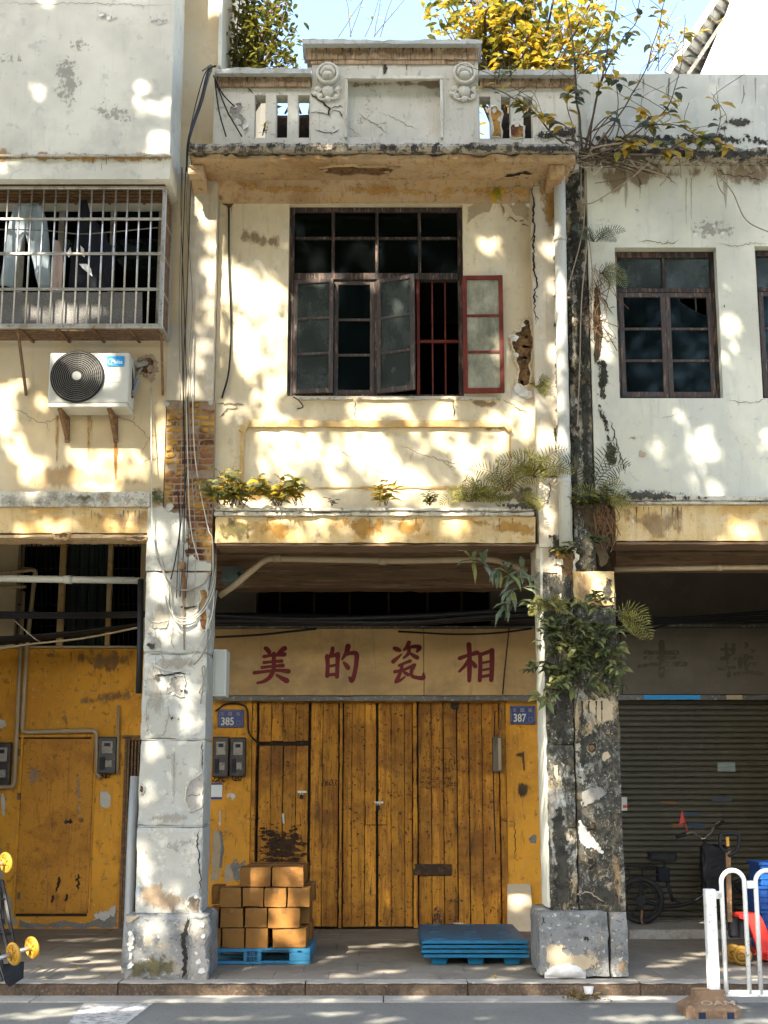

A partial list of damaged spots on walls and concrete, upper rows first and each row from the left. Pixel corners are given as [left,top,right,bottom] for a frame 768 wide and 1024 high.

crack [310,93,412,134]
leakage [514,118,768,192]
crack [500,171,539,324]
flaking render [508,317,534,404]
leakage [548,182,618,624]
flaking render [162,400,216,633]
leakage [343,518,383,539]
leakage [474,501,535,535]
peeling [584,697,614,724]
peeling [581,786,606,807]
peeling [578,820,621,896]
crack [180,917,190,978]